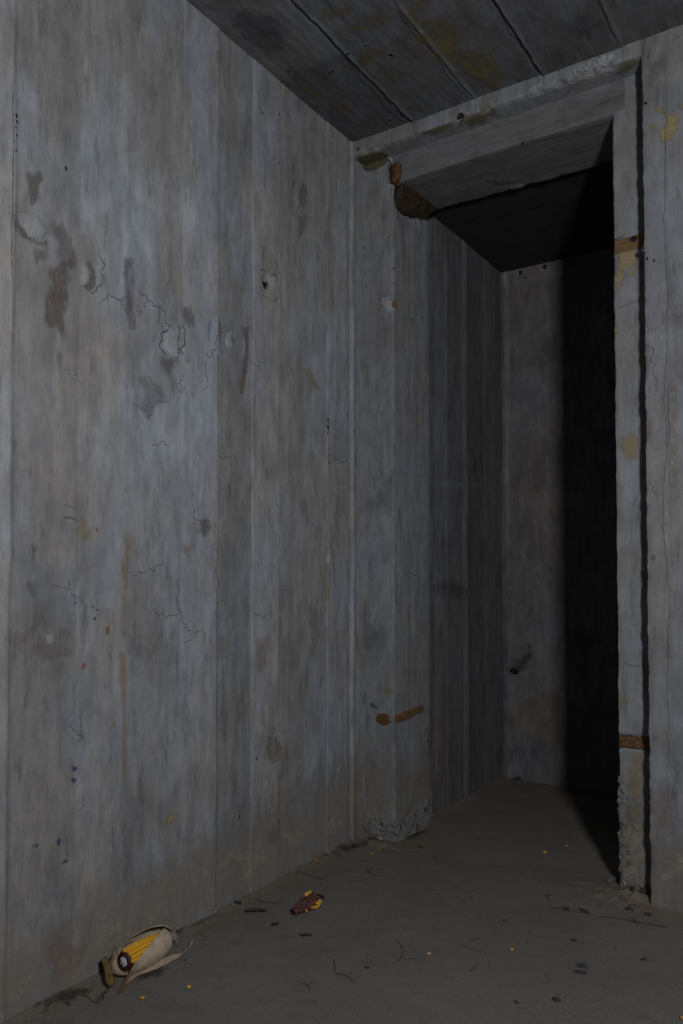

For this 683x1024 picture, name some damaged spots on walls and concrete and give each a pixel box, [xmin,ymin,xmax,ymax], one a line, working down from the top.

damp [28,173,42,202]
damp [47,255,73,332]
crack [100,284,179,331]
crack [133,545,220,643]
spalling [617,775,630,887]